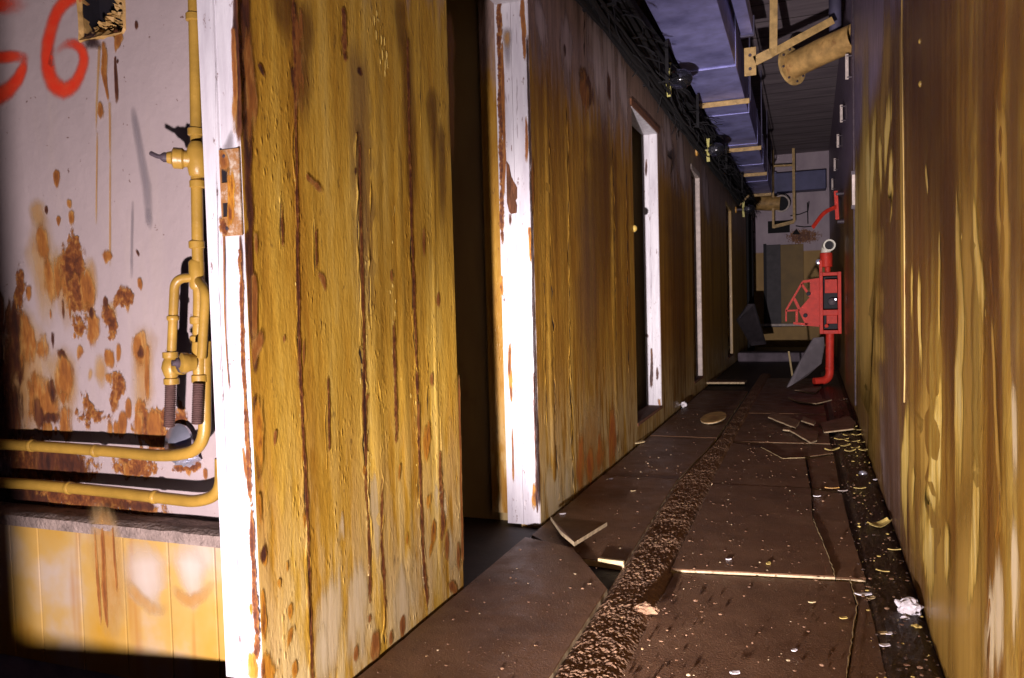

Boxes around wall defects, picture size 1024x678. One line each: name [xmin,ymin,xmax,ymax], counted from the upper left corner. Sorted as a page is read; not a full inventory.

spalling [76,0,126,47]
corrosion [96,33,123,150]
corrosion [496,3,506,242]
corrosion [315,227,326,290]
corrosion [219,0,277,678]
corrosion [0,200,187,627]
corrosion [172,462,207,479]